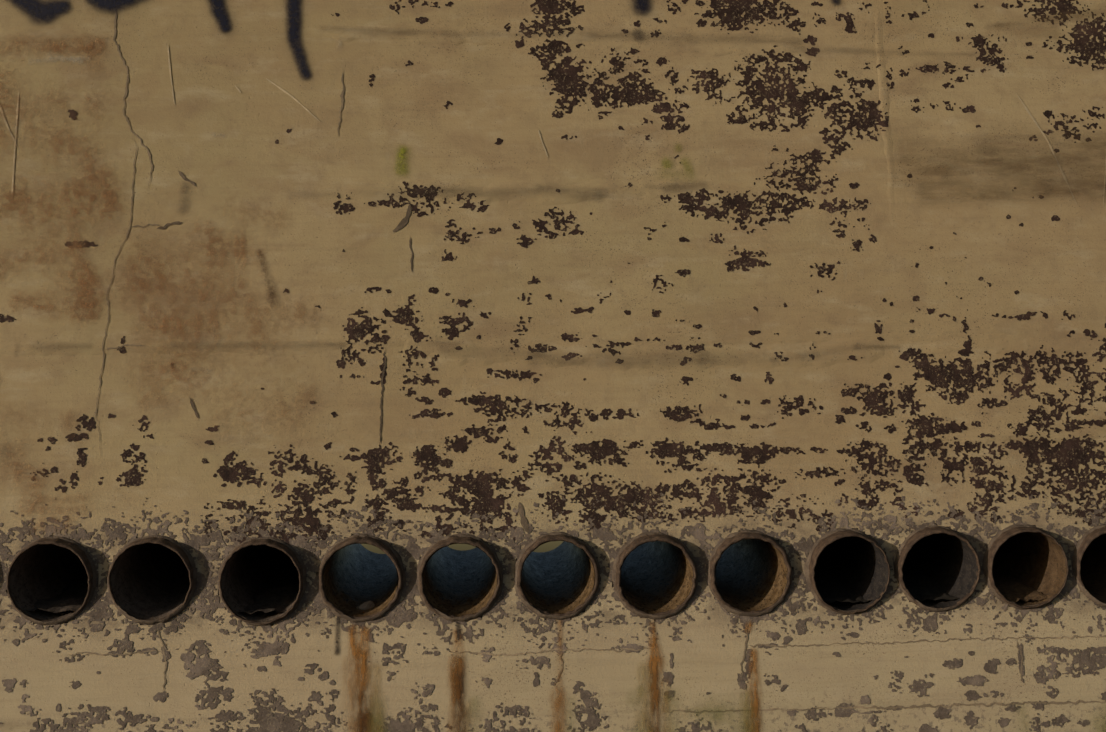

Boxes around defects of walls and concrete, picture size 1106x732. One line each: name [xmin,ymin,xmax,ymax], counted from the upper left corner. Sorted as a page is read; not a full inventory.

peeling [389,0,454,24]
peeling [1001,0,1106,71]
peeling [504,0,1008,272]
peeling [1029,106,1105,153]
crack [95,12,196,451]
peeling [333,181,584,261]
peeling [651,269,691,293]
peeling [810,261,840,293]
peeling [0,276,1106,732]
rust [350,628,373,732]
rust [451,656,465,732]
rust [648,638,661,732]